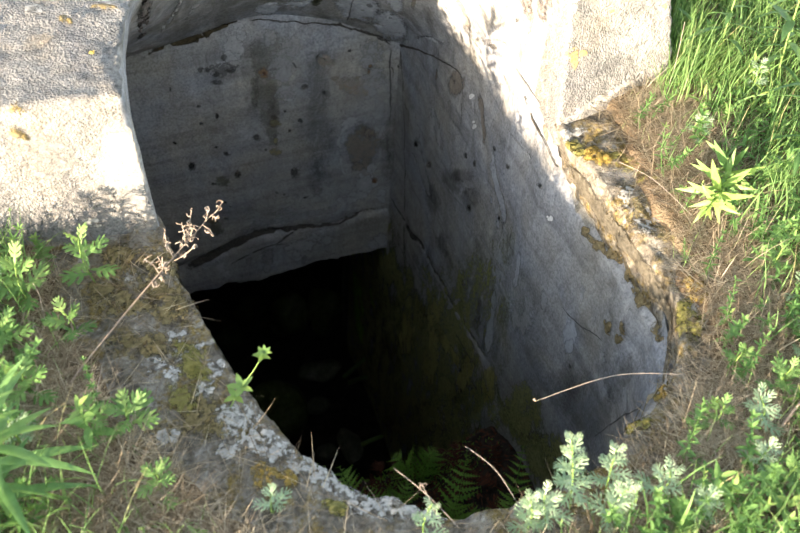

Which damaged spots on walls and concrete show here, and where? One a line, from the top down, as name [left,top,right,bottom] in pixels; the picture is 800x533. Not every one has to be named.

crack [524,96,558,167]
crack [188,208,374,269]
crack [389,52,485,363]